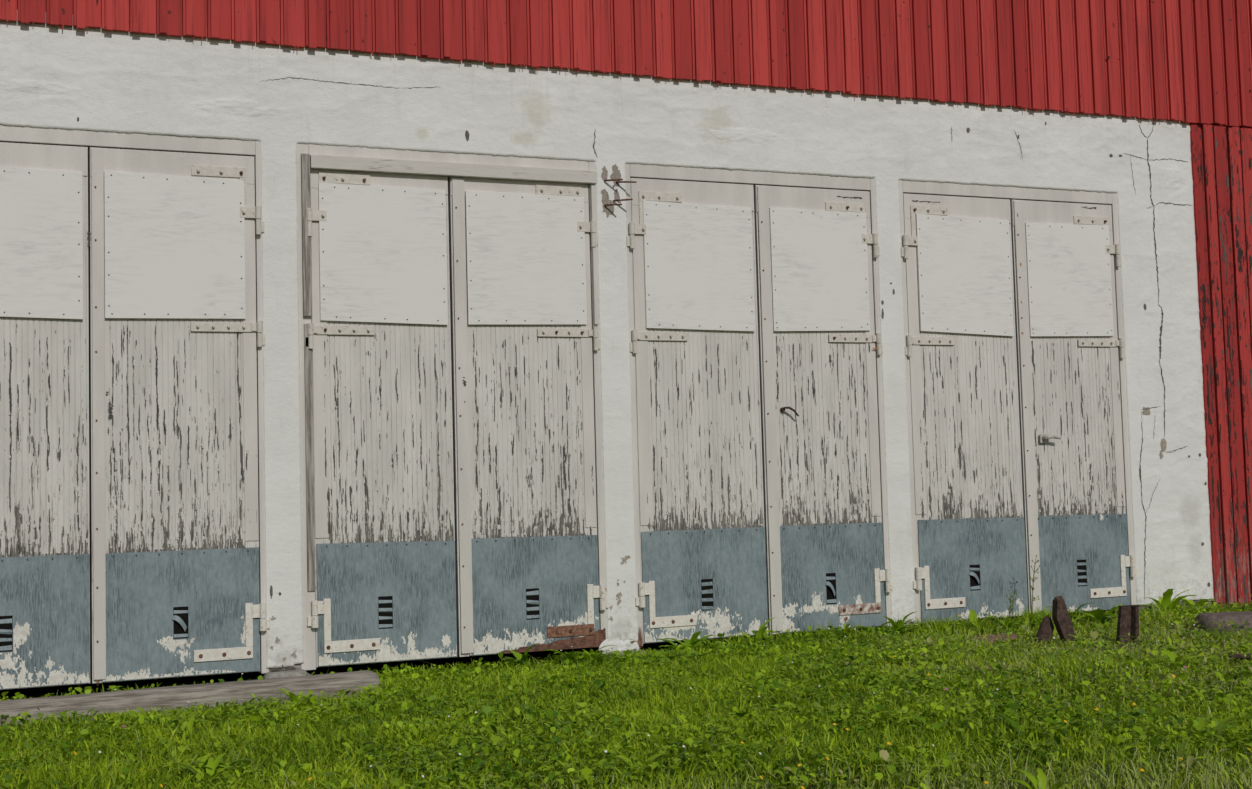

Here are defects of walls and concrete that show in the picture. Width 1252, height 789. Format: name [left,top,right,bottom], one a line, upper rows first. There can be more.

peeling [0,329,88,557]
peeling [106,325,249,553]
peeling [324,330,454,543]
peeling [462,330,594,539]
peeling [647,336,764,531]
peeling [776,336,877,526]
peeling [920,342,1023,520]
peeling [1031,341,1124,520]
crack [1122,126,1212,611]
peeling [0,622,236,689]
rust [497,628,606,654]
peeling [645,591,863,642]